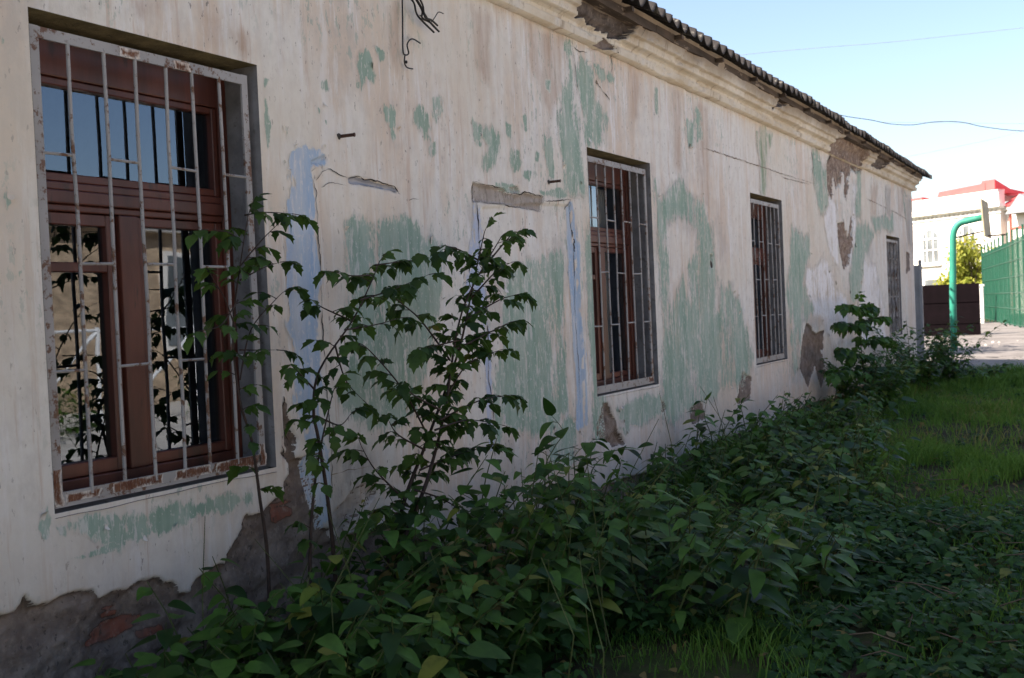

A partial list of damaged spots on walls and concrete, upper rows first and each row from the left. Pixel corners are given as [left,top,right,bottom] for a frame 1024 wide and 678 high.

corrosion [120,47,140,59]
corrosion [174,60,191,72]
spalling [348,177,399,194]
peeling [263,77,331,530]
peeling [464,38,754,470]
peeling [785,148,907,388]
corrosion [53,443,267,507]
peeling [36,487,253,560]